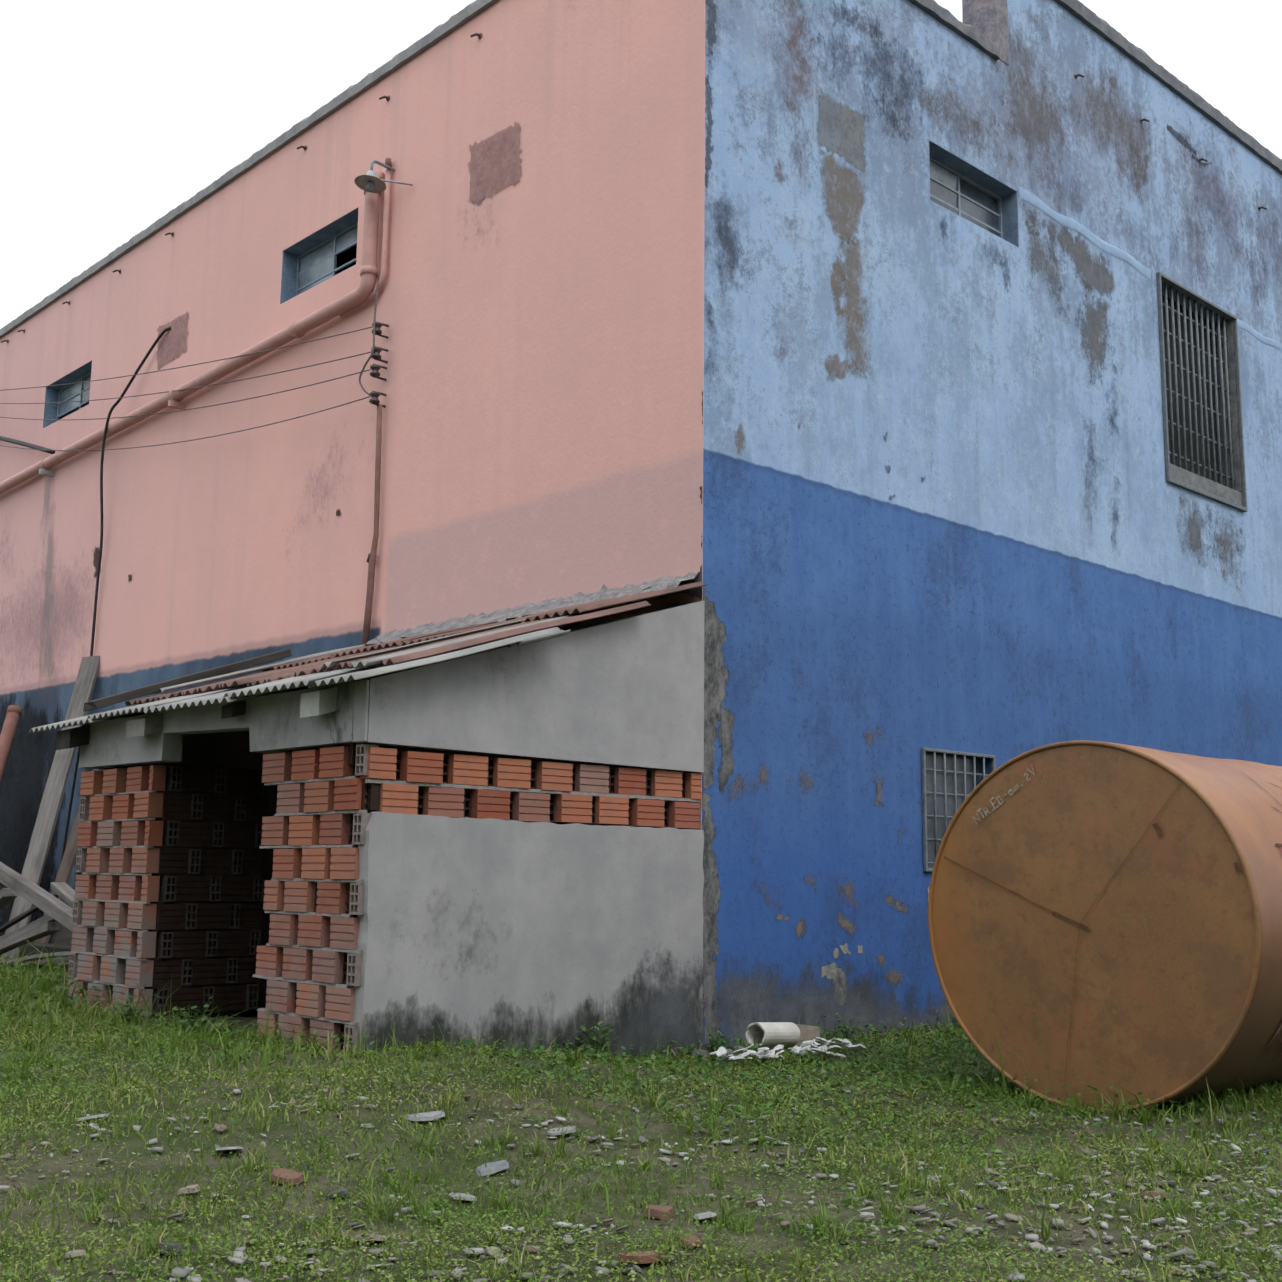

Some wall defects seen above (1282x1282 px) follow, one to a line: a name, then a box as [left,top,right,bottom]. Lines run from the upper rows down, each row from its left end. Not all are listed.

flaking render [469,122,522,205]
flaking render [817,94,866,171]
leakage [0,696,60,874]
leakage [39,794,65,892]
spalling [685,565,768,1044]
leakage [0,883,15,936]
leakage [30,905,44,923]
peeling [755,884,806,937]
leakage [363,958,958,1062]